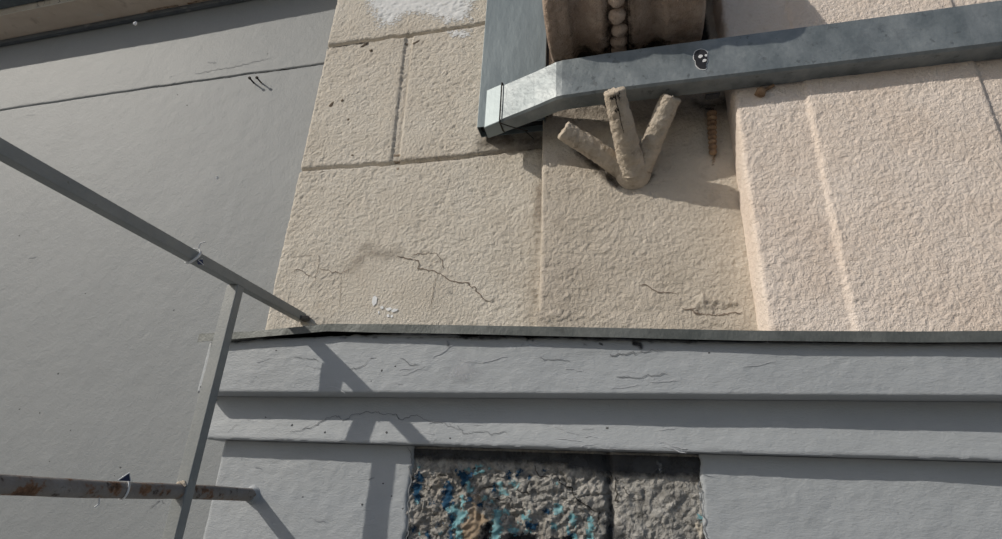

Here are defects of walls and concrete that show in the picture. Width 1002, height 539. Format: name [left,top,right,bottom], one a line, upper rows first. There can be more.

crack [291,254,350,310]
crack [395,252,492,312]
crack [610,349,668,378]
crack [293,411,507,435]
spalling [402,438,708,539]